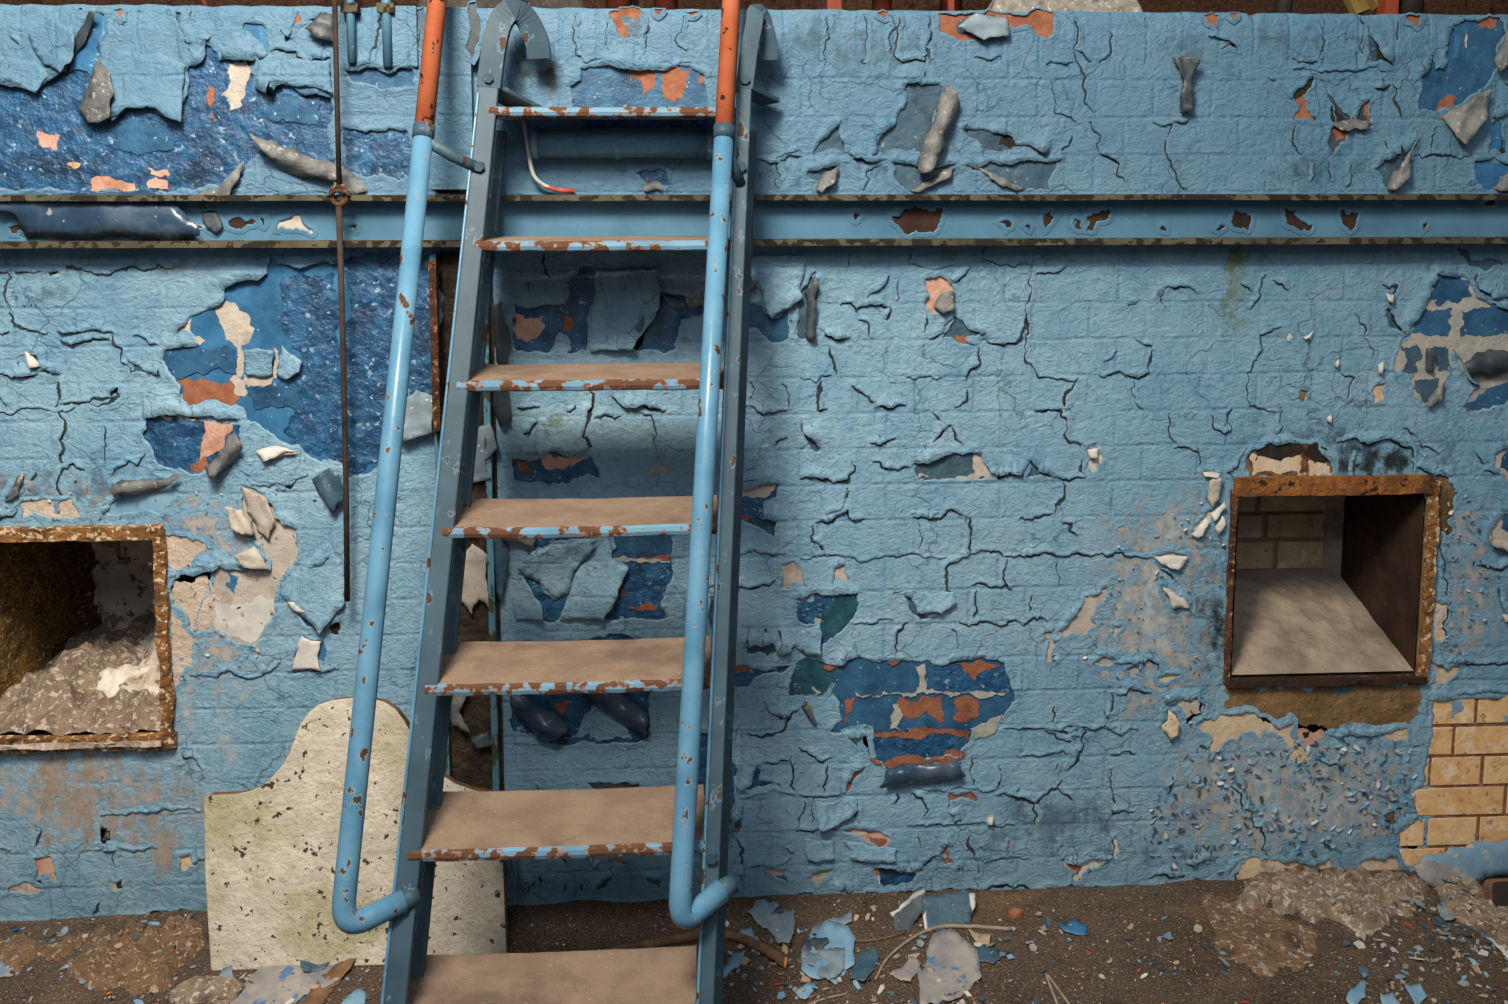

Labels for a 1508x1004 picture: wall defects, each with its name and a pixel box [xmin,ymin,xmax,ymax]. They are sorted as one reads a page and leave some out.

crack [223,15,382,67]
crack [0,257,172,520]
peeling [0,6,426,693]
peeling [403,247,460,442]
crack [517,390,666,458]
peeling [492,257,705,365]
crack [709,247,1290,661]
flaking render [1037,243,1508,888]
crack [1336,280,1501,478]
peeling [450,691,656,751]
peeling [723,467,1025,1004]
crack [798,649,1272,895]